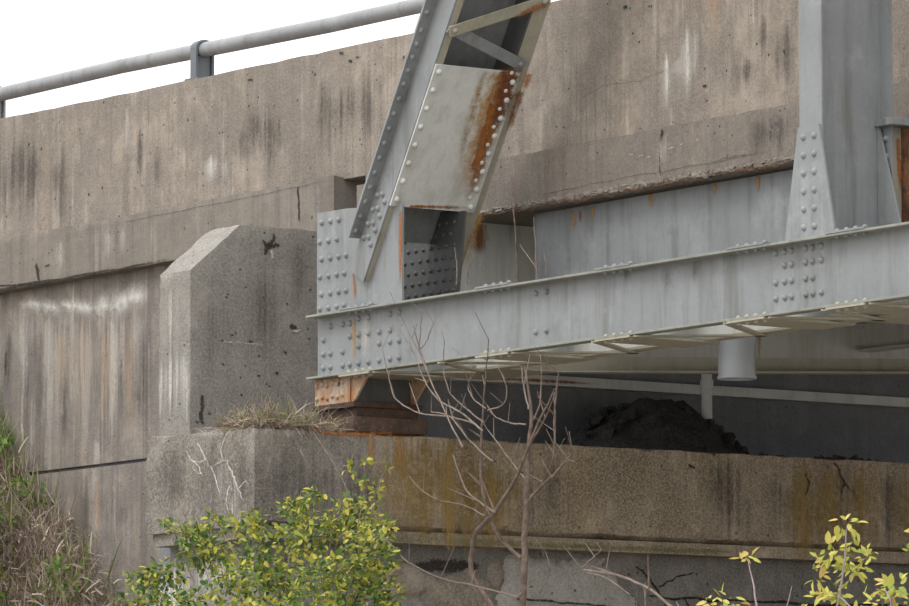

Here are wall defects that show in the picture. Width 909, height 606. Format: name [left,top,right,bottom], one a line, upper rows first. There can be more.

corrosion [468,68,532,177]
damp [25,300,90,312]
damp [101,289,141,309]
damp [386,441,517,545]
peeling [379,552,637,606]
crack [636,566,906,606]